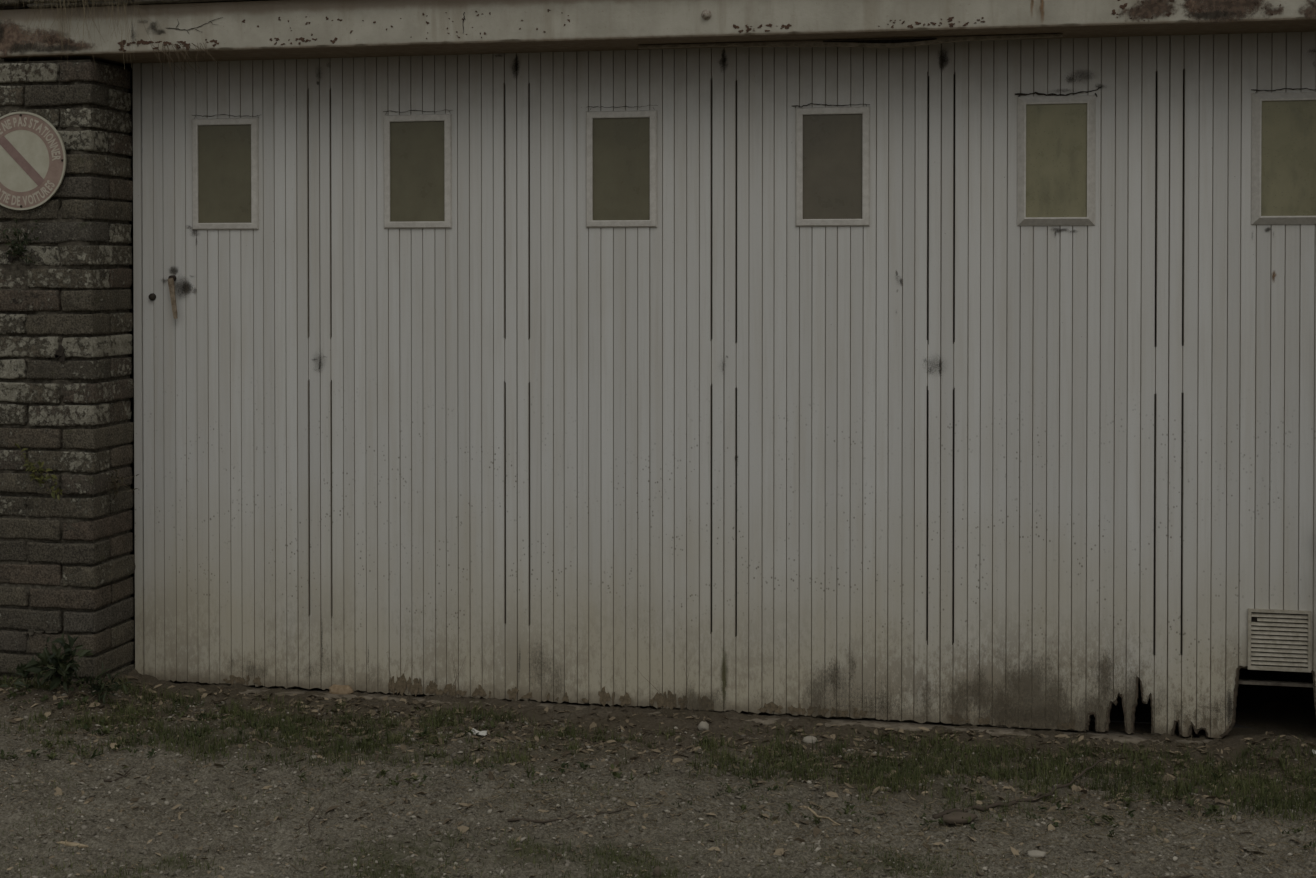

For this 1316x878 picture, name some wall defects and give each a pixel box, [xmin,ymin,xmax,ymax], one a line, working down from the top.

rust [1119,0,1284,23]
leakage [951,658,1154,733]